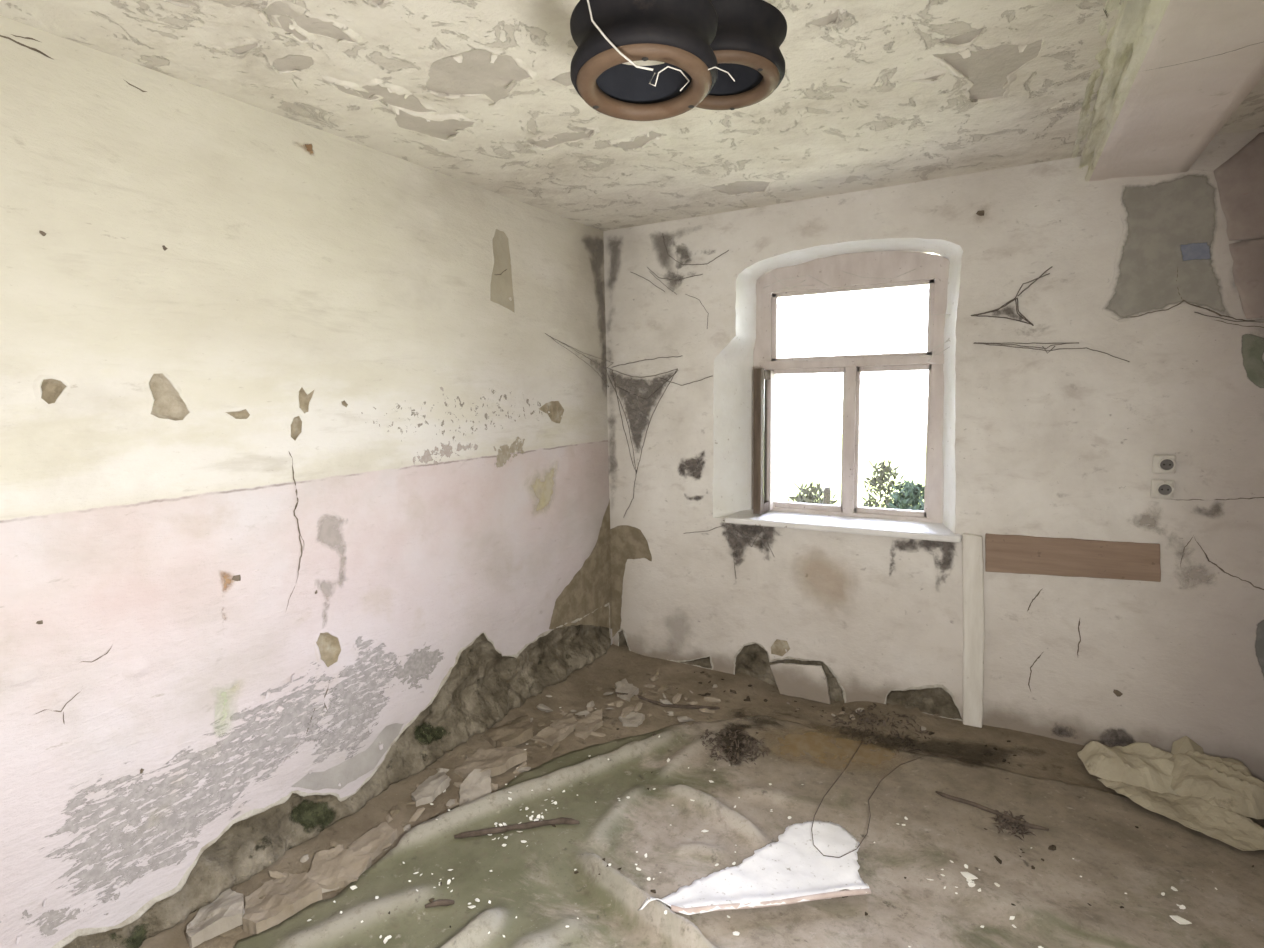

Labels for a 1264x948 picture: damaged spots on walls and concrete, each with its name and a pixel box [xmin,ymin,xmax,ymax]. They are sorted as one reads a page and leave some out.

peeling [219,0,573,141]
peeling [906,25,1046,103]
peeling [1098,169,1236,325]
flaking render [32,375,72,406]
flaking render [144,371,194,423]
flaking render [286,384,316,442]
peeling [339,387,564,468]
crack [285,452,304,613]
leakage [722,523,775,564]
leakage [895,539,954,579]
crack [1180,537,1264,590]
flaking render [16,603,631,948]